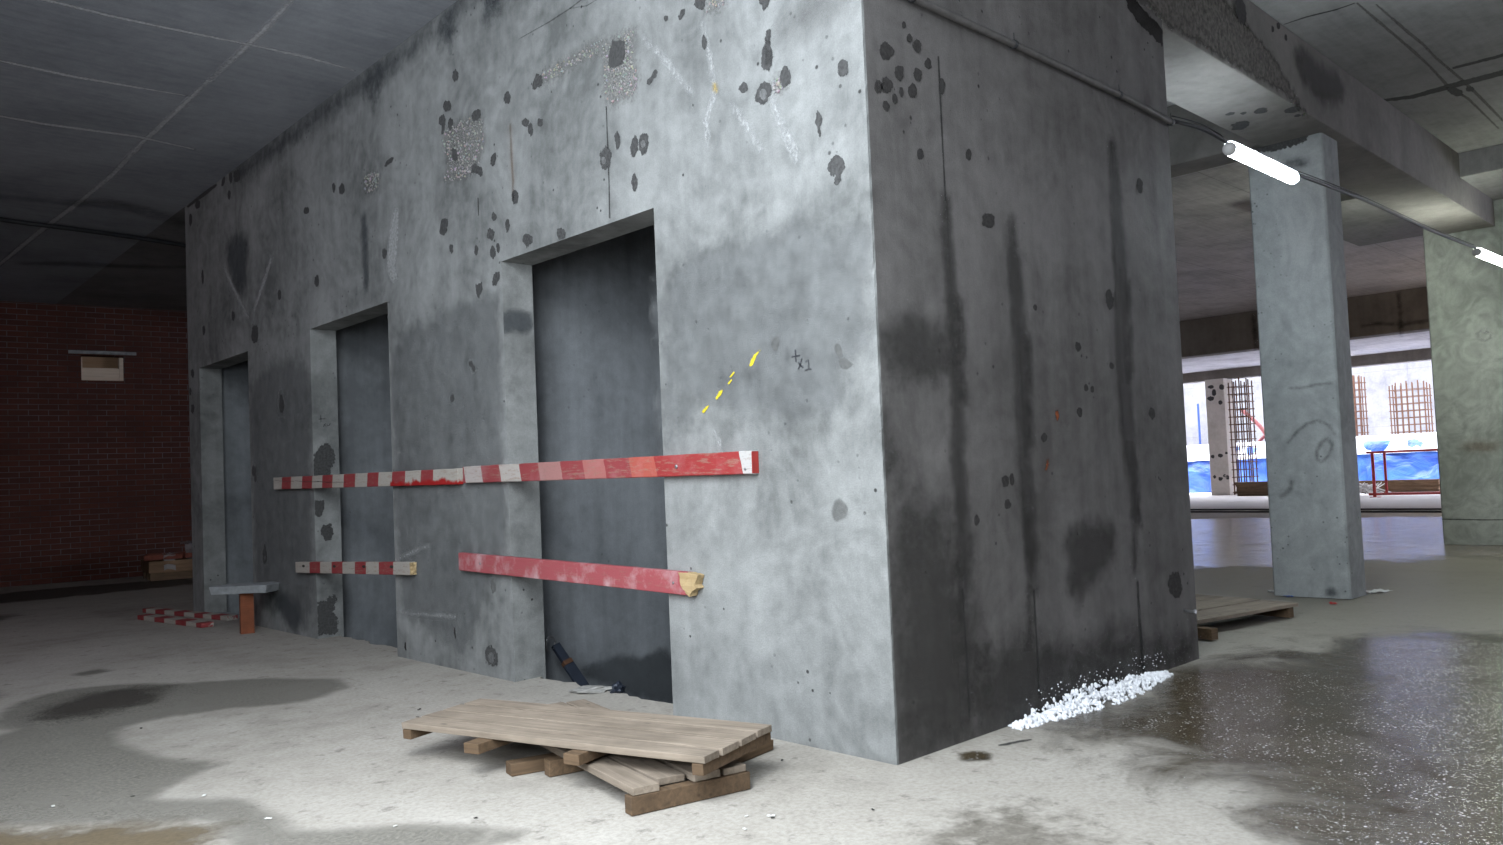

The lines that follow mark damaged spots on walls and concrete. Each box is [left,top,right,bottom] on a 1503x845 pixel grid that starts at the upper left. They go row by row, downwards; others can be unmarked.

spalling [1126,0,1163,47]
water stain [885,142,1192,749]
water stain [0,670,513,845]